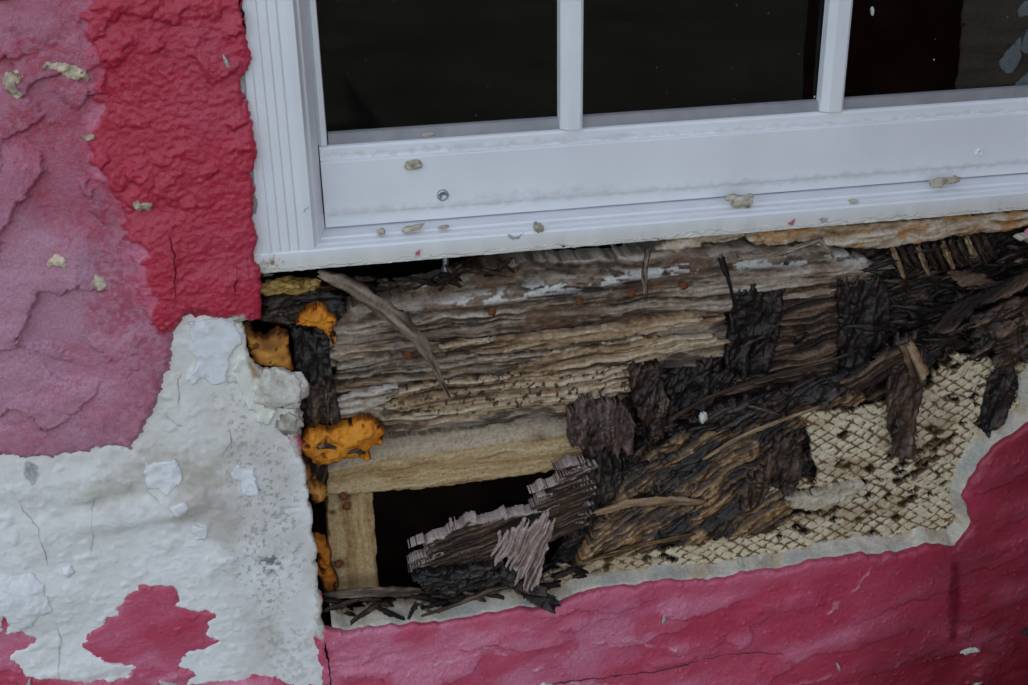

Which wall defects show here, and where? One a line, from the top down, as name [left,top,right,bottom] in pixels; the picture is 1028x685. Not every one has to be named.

flaking render [1,70,24,99]
flaking render [42,61,90,82]
flaking render [133,200,153,212]
flaking render [46,254,67,268]
peeling [259,206,1028,300]
flaking render [91,275,107,292]
spalling [547,360,1028,601]
peeling [0,314,556,685]
spalling [544,536,563,562]
crack [323,642,331,685]